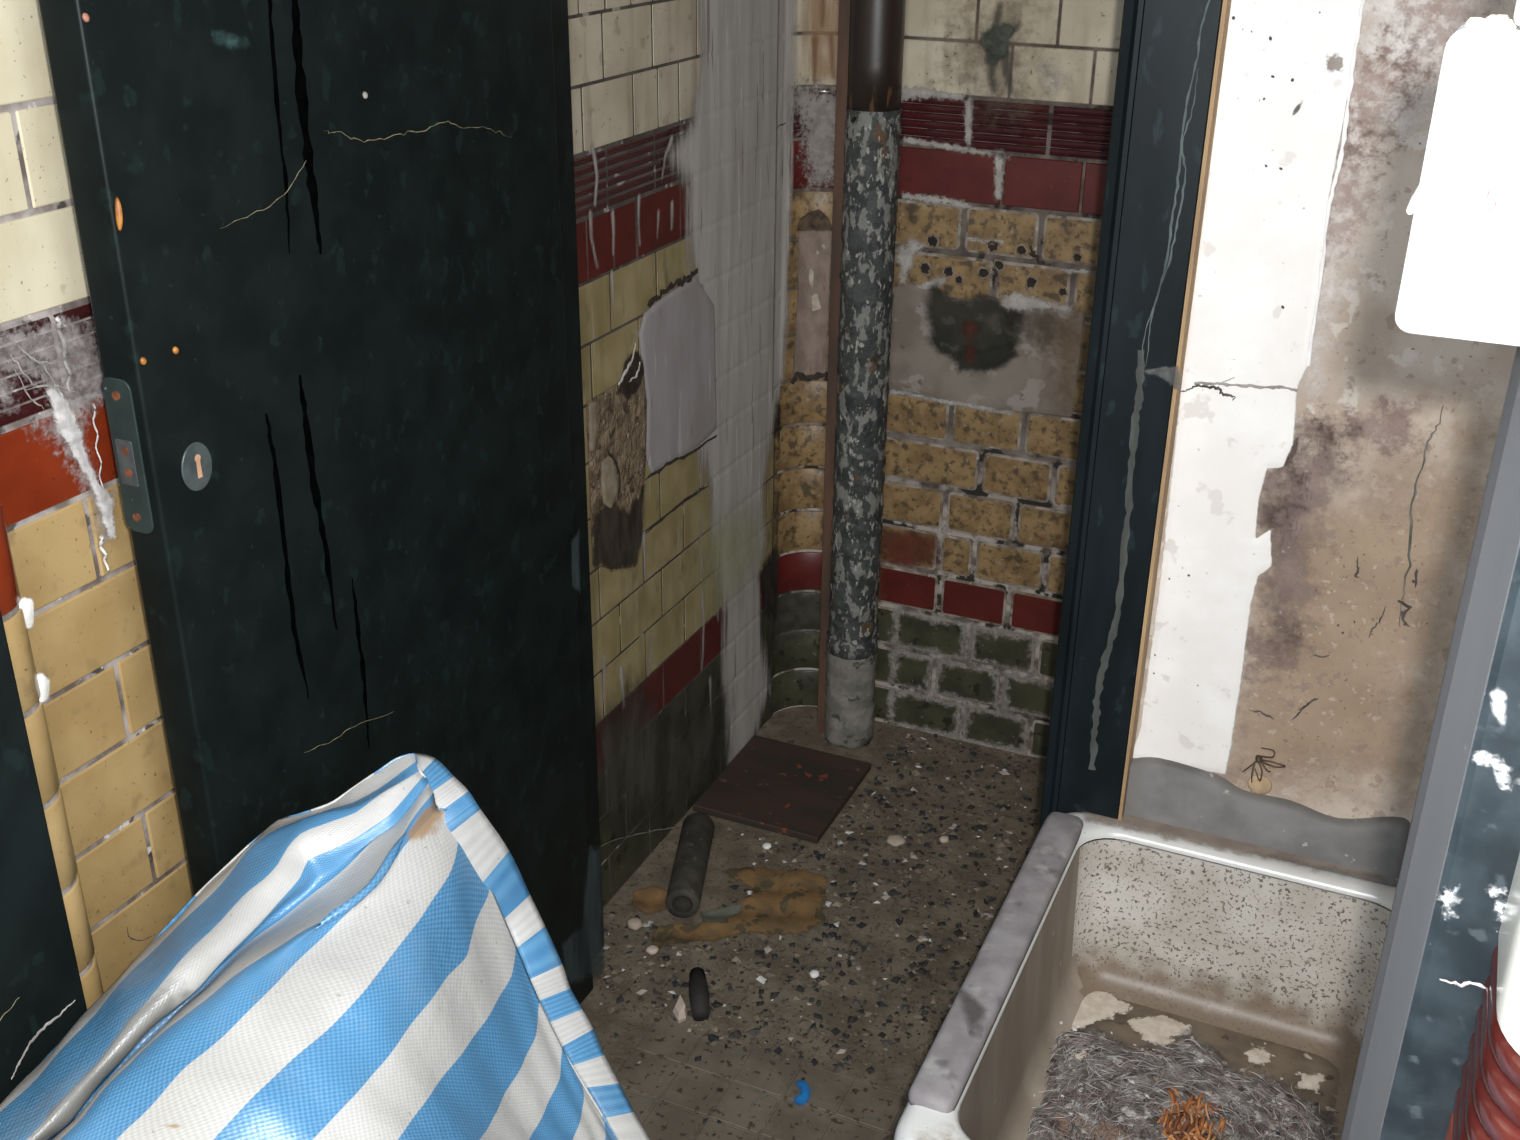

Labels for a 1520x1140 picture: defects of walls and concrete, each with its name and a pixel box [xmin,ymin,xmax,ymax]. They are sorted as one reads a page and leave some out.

crack [268,0,322,255]
crack [265,374,370,747]
water stain [589,143,614,301]
spalling [586,343,717,570]
spalling [647,268,698,309]
water stain [598,0,837,812]
crack [1088,0,1210,770]
crack [1180,377,1298,401]
peeling [1133,0,1365,774]
water stain [1226,396,1476,780]
water stain [1326,0,1489,243]
crack [1397,405,1444,627]